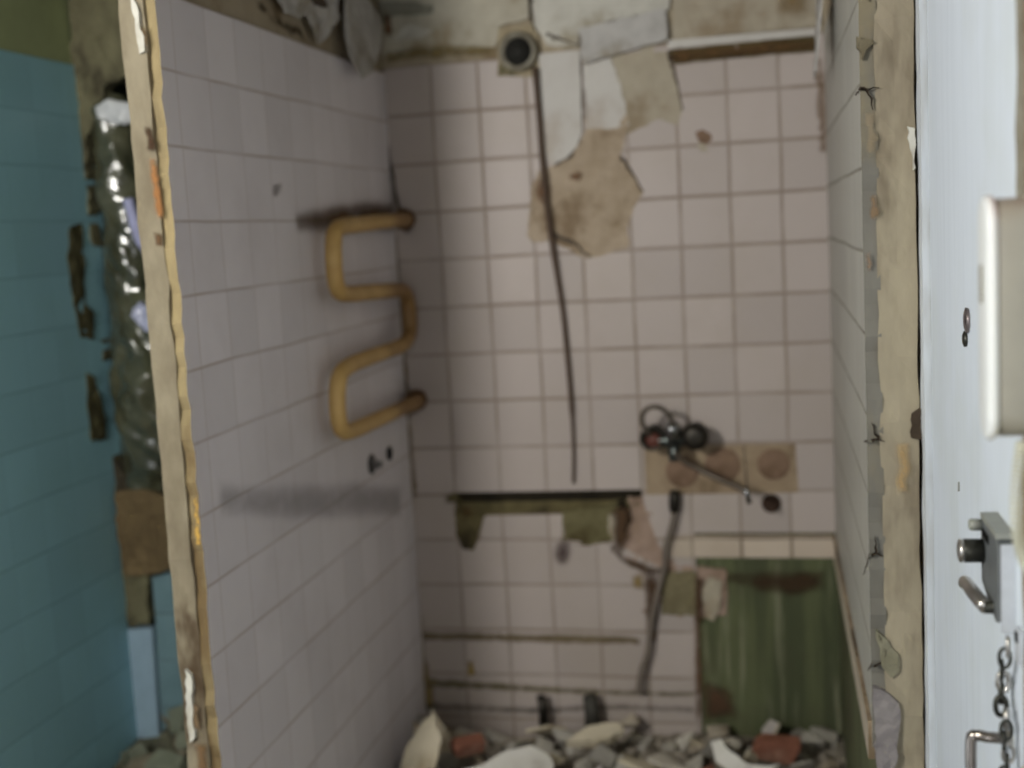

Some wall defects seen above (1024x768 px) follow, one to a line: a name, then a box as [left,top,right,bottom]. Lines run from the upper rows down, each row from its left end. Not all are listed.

crack [855,87,879,110]
spalling [378,0,816,259]
spalling [67,0,148,361]
spalling [86,373,107,442]
crack [864,423,885,443]
spalling [112,453,128,492]
spalling [454,506,485,551]
crack [863,537,882,575]
spalling [122,567,170,627]